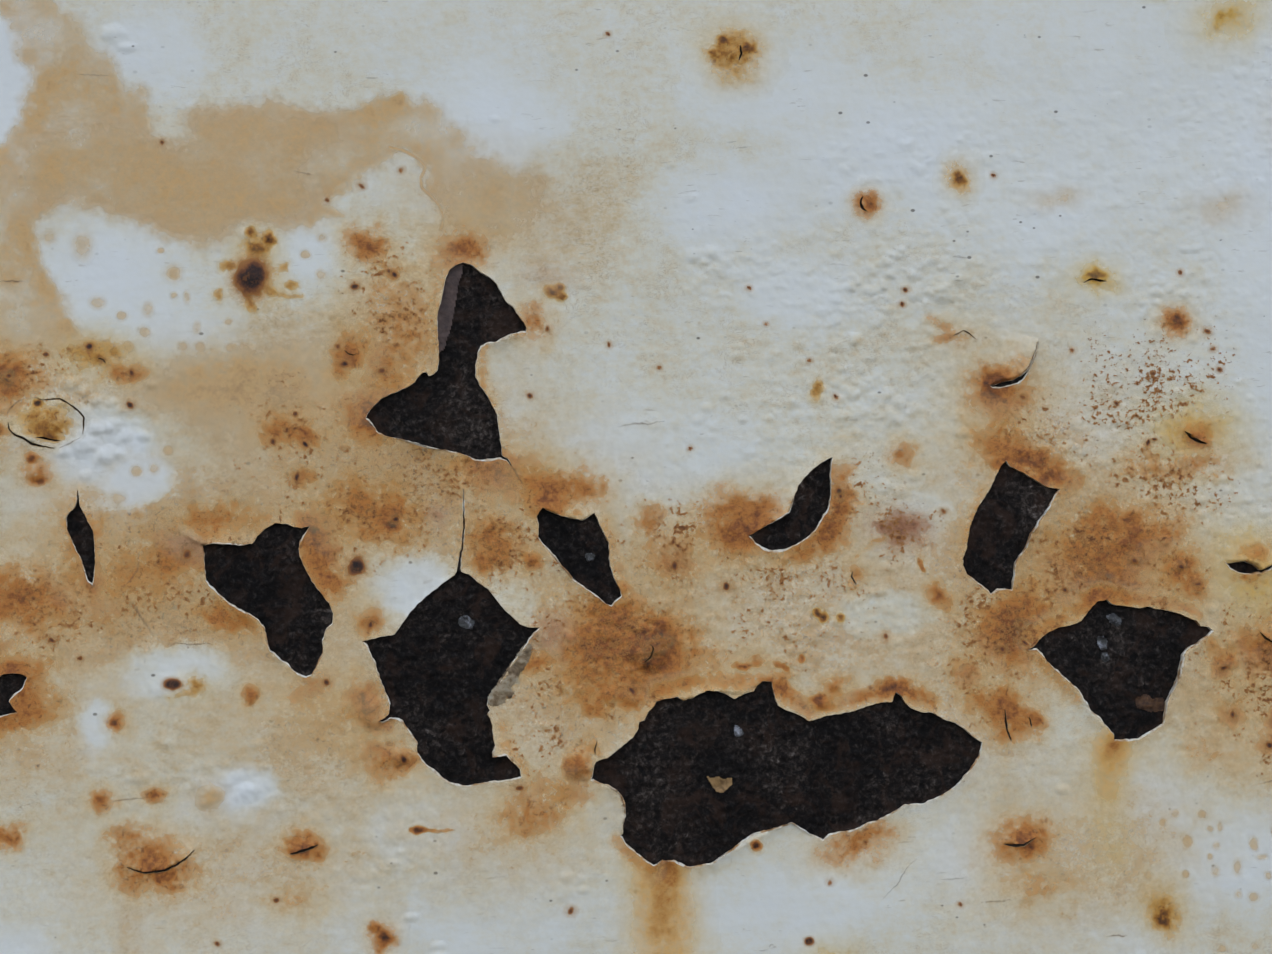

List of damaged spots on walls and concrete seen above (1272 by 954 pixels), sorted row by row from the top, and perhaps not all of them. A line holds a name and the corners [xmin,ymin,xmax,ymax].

water stain [0,0,509,364]
peeling [366,263,526,466]
peeling [201,523,333,678]
corrosion [0,224,607,783]
peeling [362,489,540,787]
corrosion [482,308,1240,845]
peeling [963,461,1060,595]
peeling [1028,599,1213,741]
corrosion [109,825,202,897]
corrosion [283,829,328,862]
corrosion [613,837,692,954]
peeling [591,681,982,869]